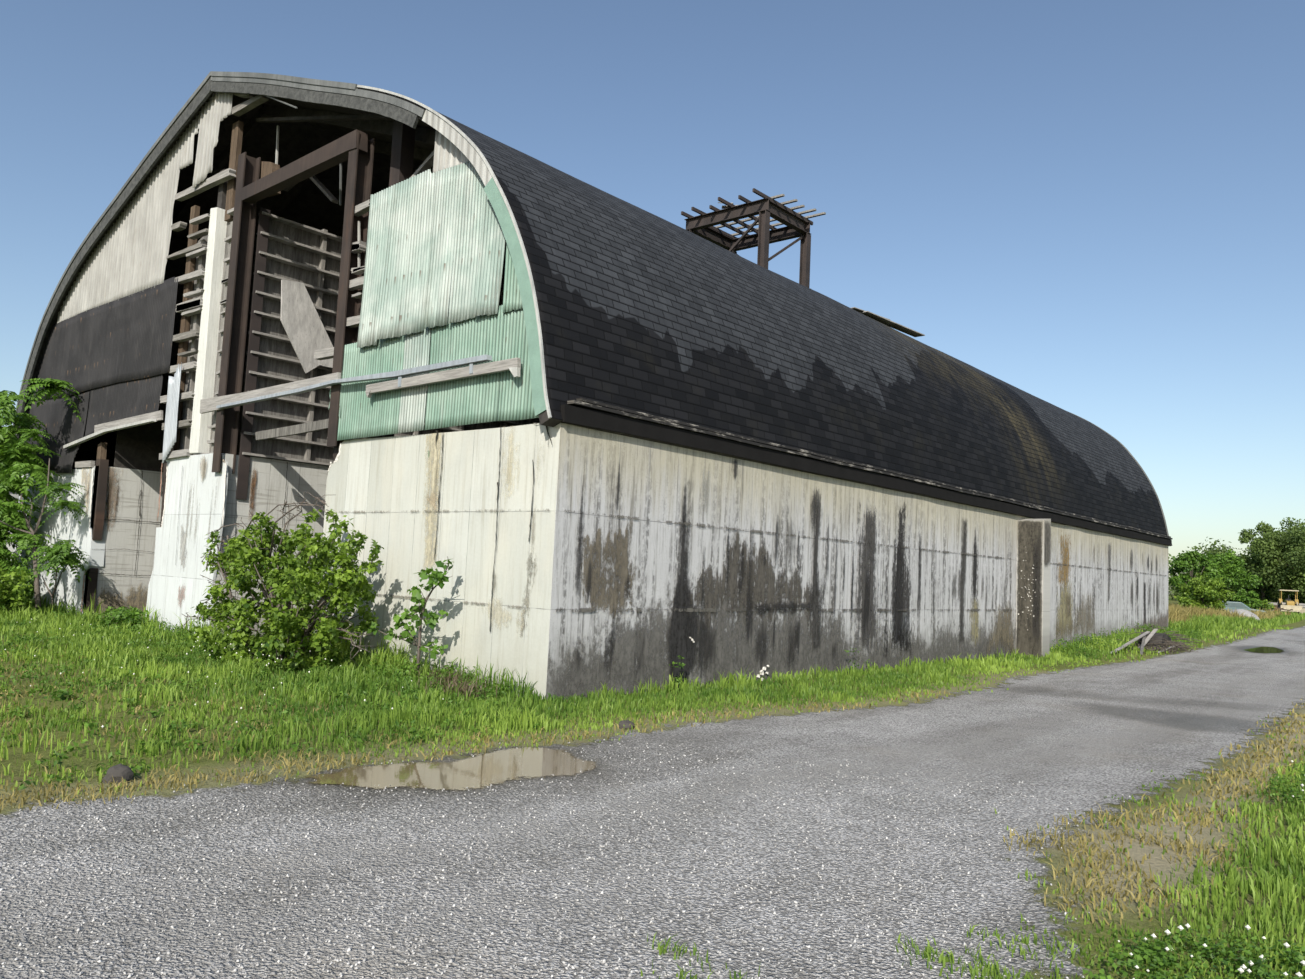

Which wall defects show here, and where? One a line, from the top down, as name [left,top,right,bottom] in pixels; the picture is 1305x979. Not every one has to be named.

leakage [548,472,1168,700]